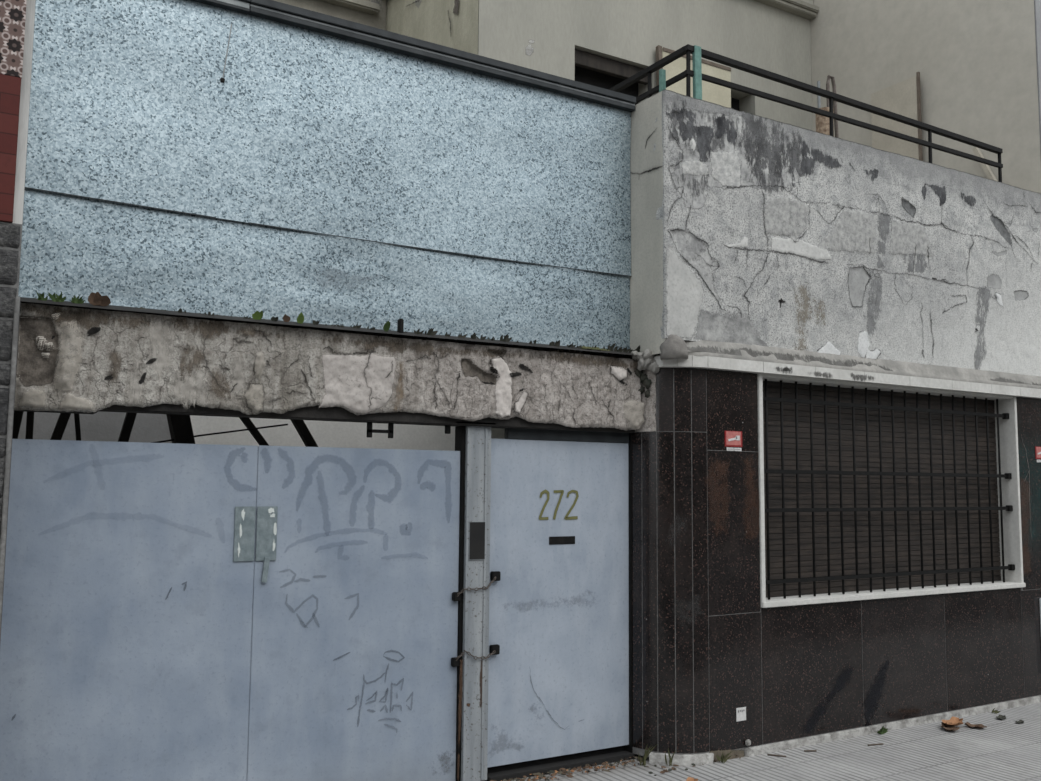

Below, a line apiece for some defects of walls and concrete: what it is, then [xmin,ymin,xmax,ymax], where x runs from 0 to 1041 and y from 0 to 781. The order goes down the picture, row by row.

peeling [670,108,877,260]
crack [630,111,1039,358]
water stain [867,213,892,334]
flaking render [991,215,1011,256]
flaking render [16,313,60,408]
flaking render [61,393,94,410]
crack [203,335,238,392]
crack [233,330,460,410]
peeling [319,353,396,413]
peeling [461,349,533,418]
peeling [609,365,632,385]
water stain [974,287,997,370]